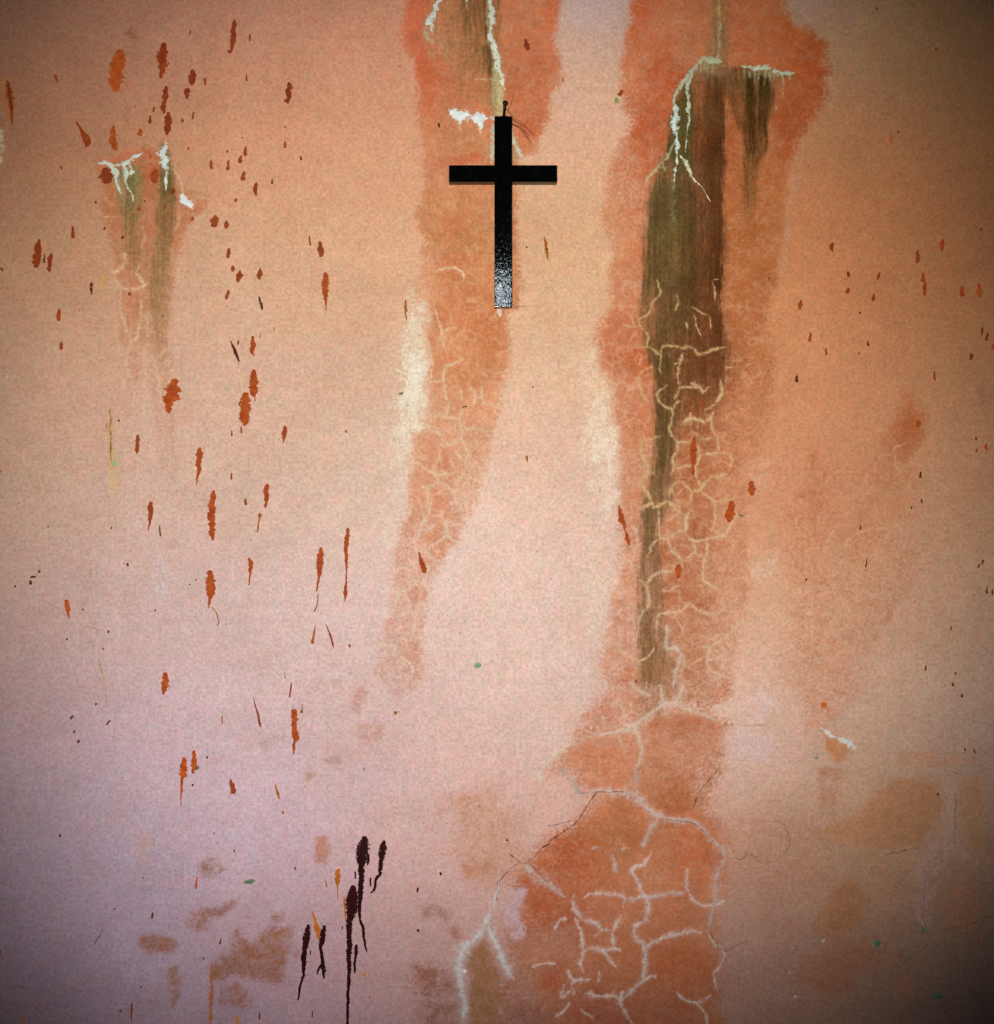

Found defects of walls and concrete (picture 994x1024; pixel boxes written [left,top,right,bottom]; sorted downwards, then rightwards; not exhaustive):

leakage [97,142,209,457]
leakage [316,837,329,863]
crack [455,280,790,1024]
leakage [377,0,983,1024]